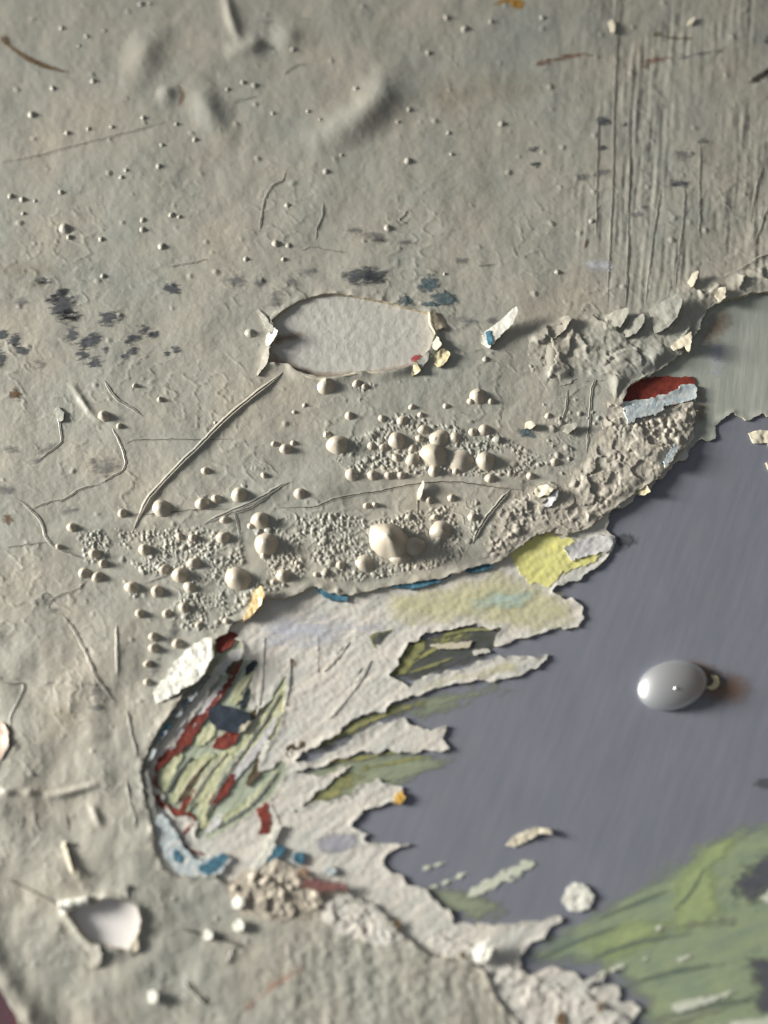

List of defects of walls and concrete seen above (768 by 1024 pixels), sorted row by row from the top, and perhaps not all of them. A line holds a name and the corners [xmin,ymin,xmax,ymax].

crack [6,372,521,832]
peeling [137,257,768,1024]
peeling [58,884,140,969]